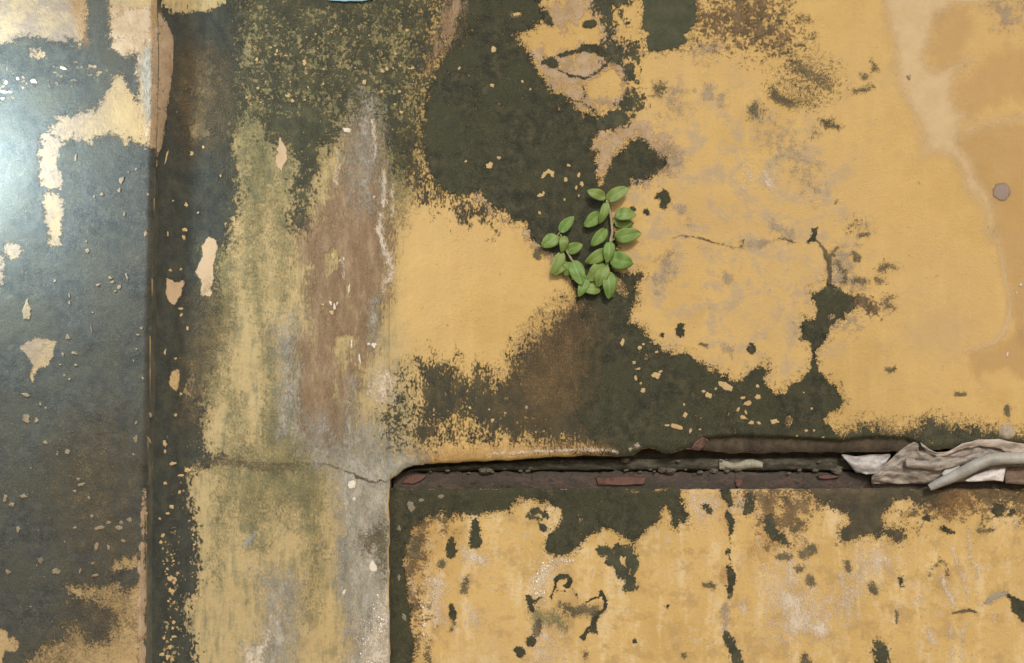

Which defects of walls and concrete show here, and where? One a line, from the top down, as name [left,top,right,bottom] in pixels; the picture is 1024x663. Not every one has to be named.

peeling [109,5,174,167]
damp [630,189,671,216]
crack [684,222,839,283]
peeling [195,237,218,297]
peeling [166,278,185,305]
damp [675,323,686,338]
peeling [169,369,180,391]
crack [185,455,385,483]